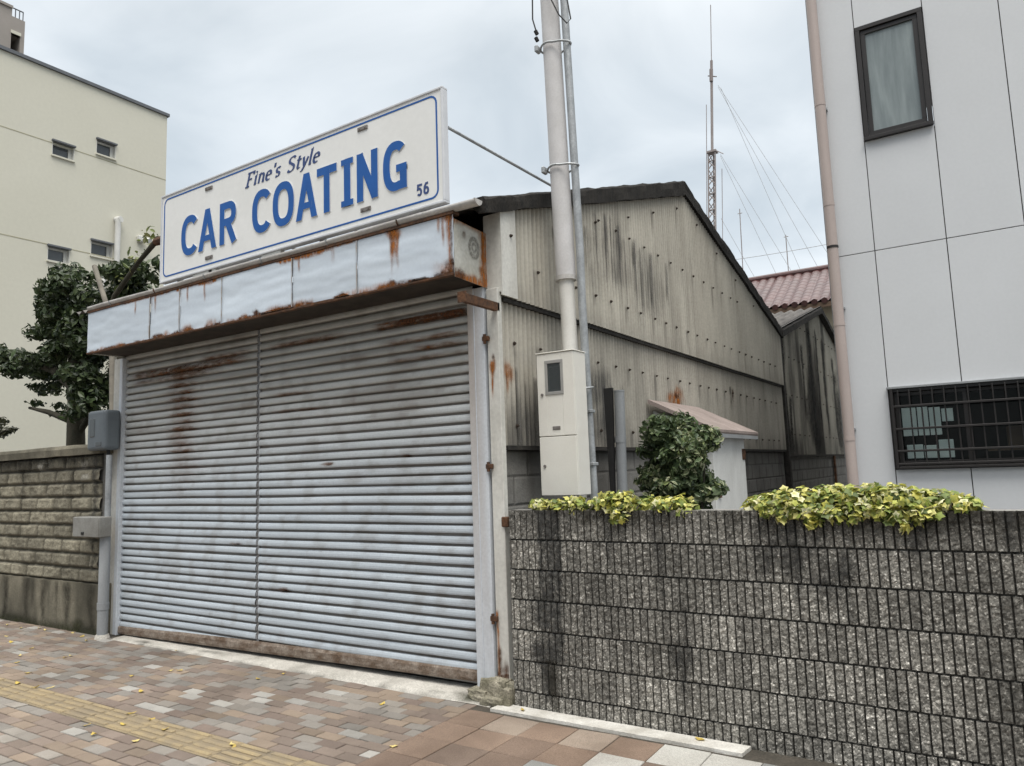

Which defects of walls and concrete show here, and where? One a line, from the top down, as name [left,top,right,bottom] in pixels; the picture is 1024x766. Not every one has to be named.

corrosion [279,241,353,267]
corrosion [387,229,400,254]
corrosion [437,215,487,288]
corrosion [233,302,312,321]
corrosion [378,308,466,350]
corrosion [136,354,237,453]
damp [801,333,842,445]